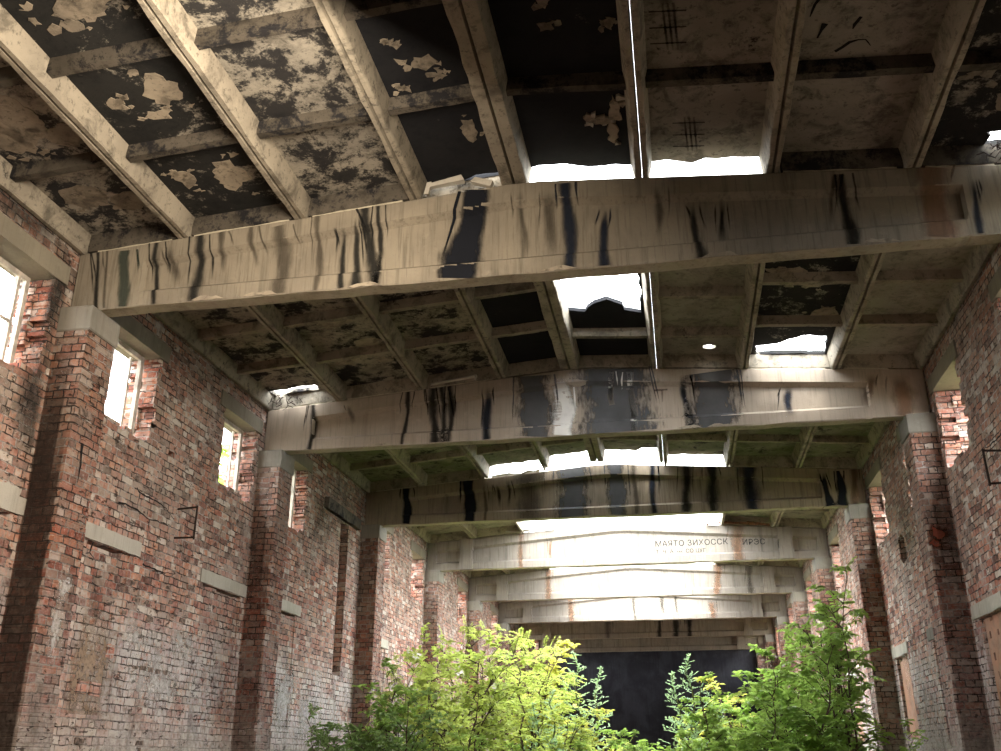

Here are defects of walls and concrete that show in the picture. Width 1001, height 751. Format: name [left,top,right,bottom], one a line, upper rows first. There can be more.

peeling [19,0,110,36]
peeling [106,69,195,121]
peeling [583,93,626,145]
peeling [957,70,1001,111]
peeling [161,169,205,192]
peeling [212,152,252,191]
damp [335,205,388,288]
damp [438,190,488,278]
damp [539,182,578,267]
damp [512,366,664,437]
damp [544,466,592,518]
damp [604,464,638,515]